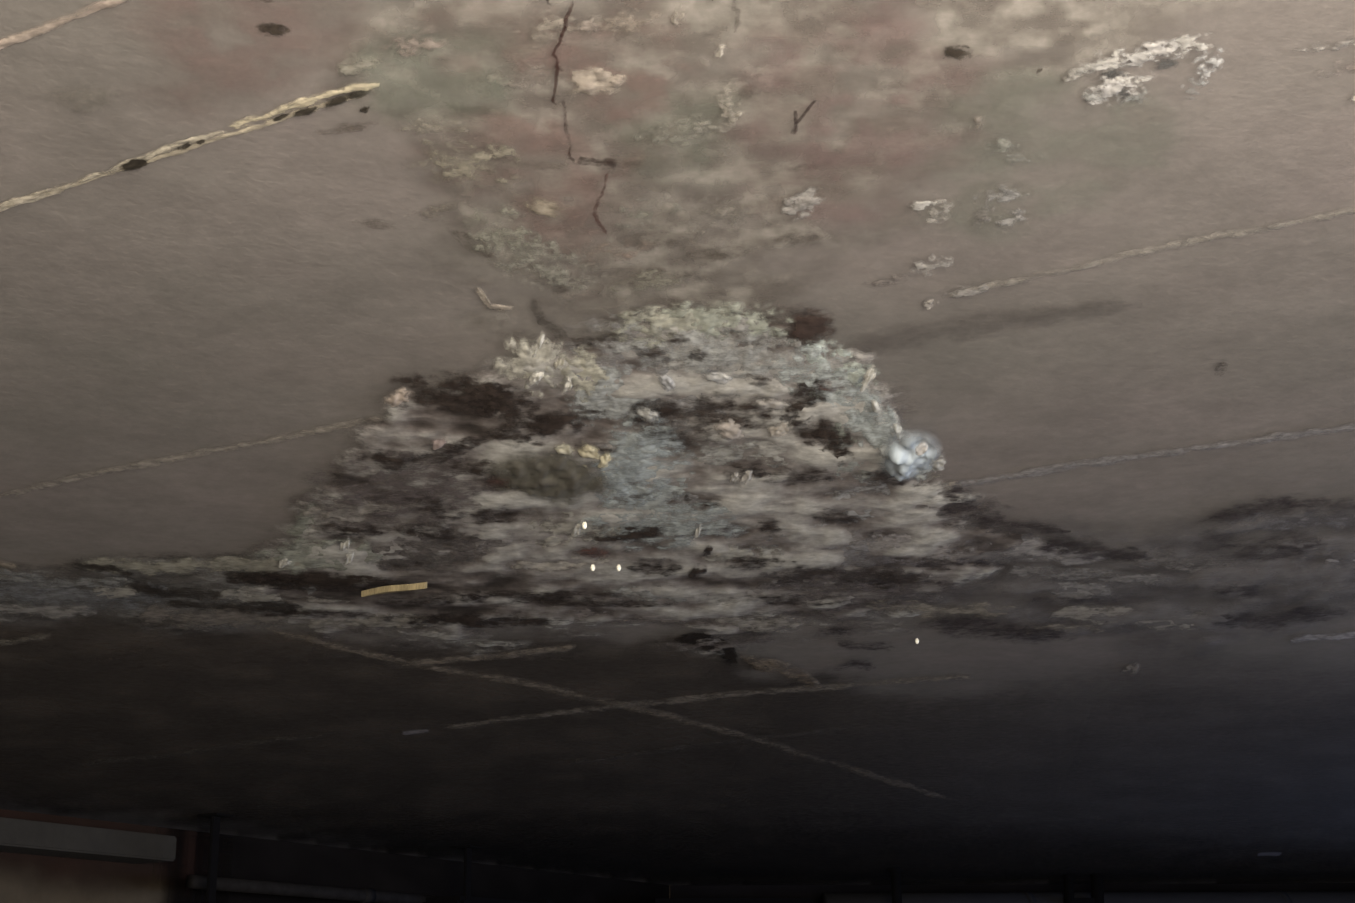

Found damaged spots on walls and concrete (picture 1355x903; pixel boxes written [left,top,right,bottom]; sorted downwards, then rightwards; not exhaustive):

peeling [383,26,444,57]
peeling [402,17,574,183]
peeling [466,199,688,293]
crack [546,0,615,232]
water stain [0,0,1223,340]
spalling [227,301,1026,689]
water stain [866,473,1355,644]